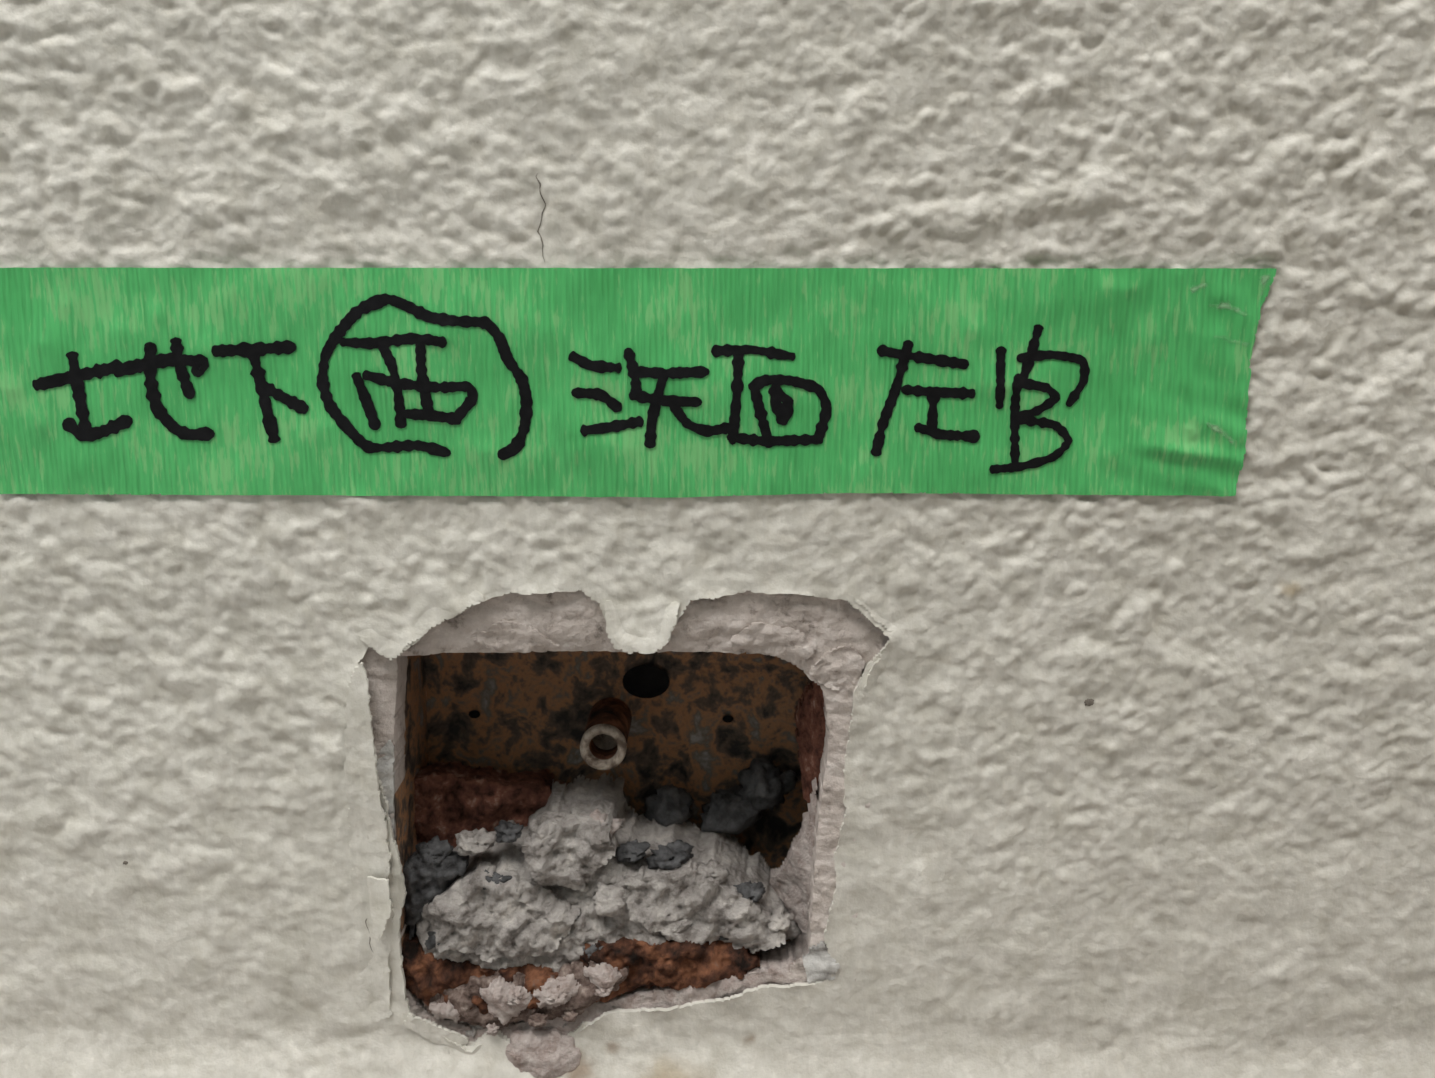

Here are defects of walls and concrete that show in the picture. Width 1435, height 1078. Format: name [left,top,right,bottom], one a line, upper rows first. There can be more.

spalling [344,590,902,1046]